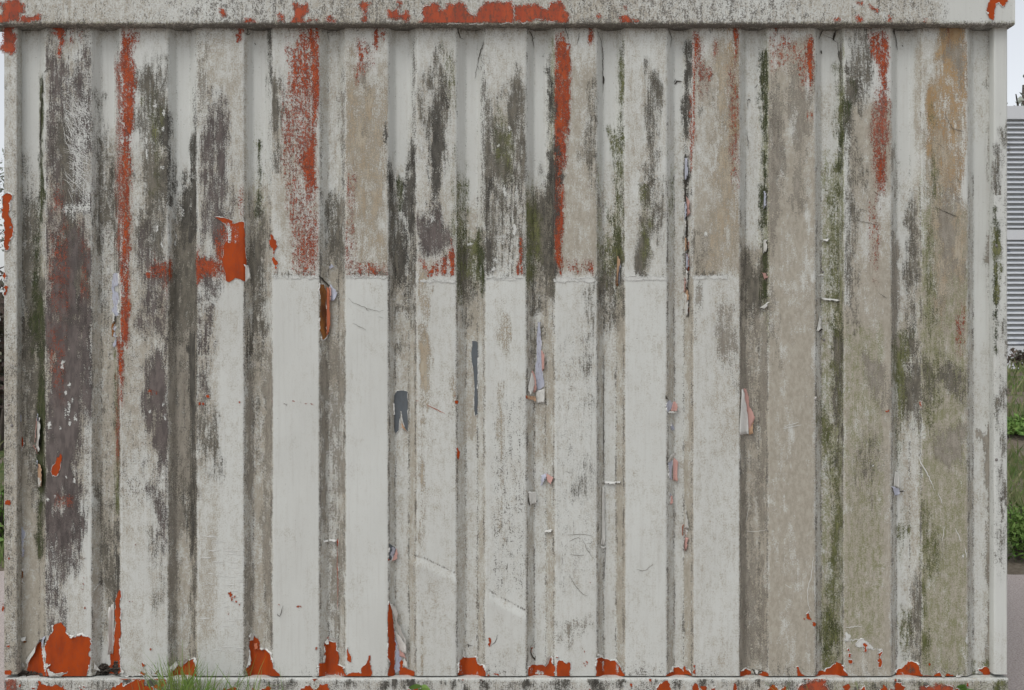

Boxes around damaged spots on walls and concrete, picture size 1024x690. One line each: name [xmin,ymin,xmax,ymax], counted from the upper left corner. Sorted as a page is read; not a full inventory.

leakage [45,28,121,636]
peeling [112,28,148,456]
leakage [133,41,237,650]
peeling [195,185,251,286]
peeling [269,1,336,276]
leakage [387,44,456,352]
peeling [354,0,594,277]
peeling [4,588,197,690]
peeling [246,633,280,690]
peeling [300,636,372,690]
peeling [387,601,418,690]
leakage [899,574,922,661]